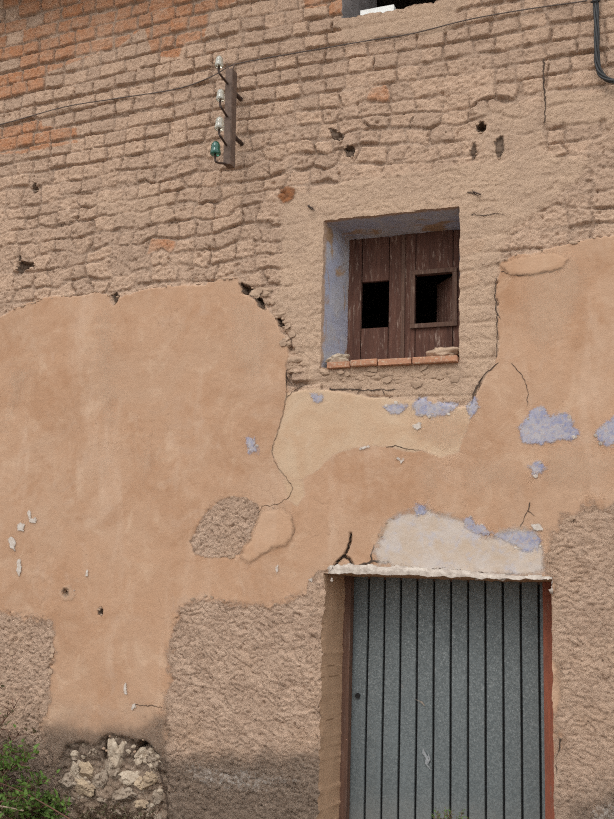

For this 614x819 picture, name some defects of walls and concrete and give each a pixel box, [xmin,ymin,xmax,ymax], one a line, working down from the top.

spalling [328,127,355,158]
flaking render [13,289,119,310]
flaking render [249,287,304,374]
crack [472,278,529,406]
crack [329,387,396,395]
flaking render [319,364,480,429]
crack [259,370,306,512]
peeling [518,407,579,445]
peeling [593,415,614,446]
crack [334,533,388,566]
spalling [0,496,614,819]